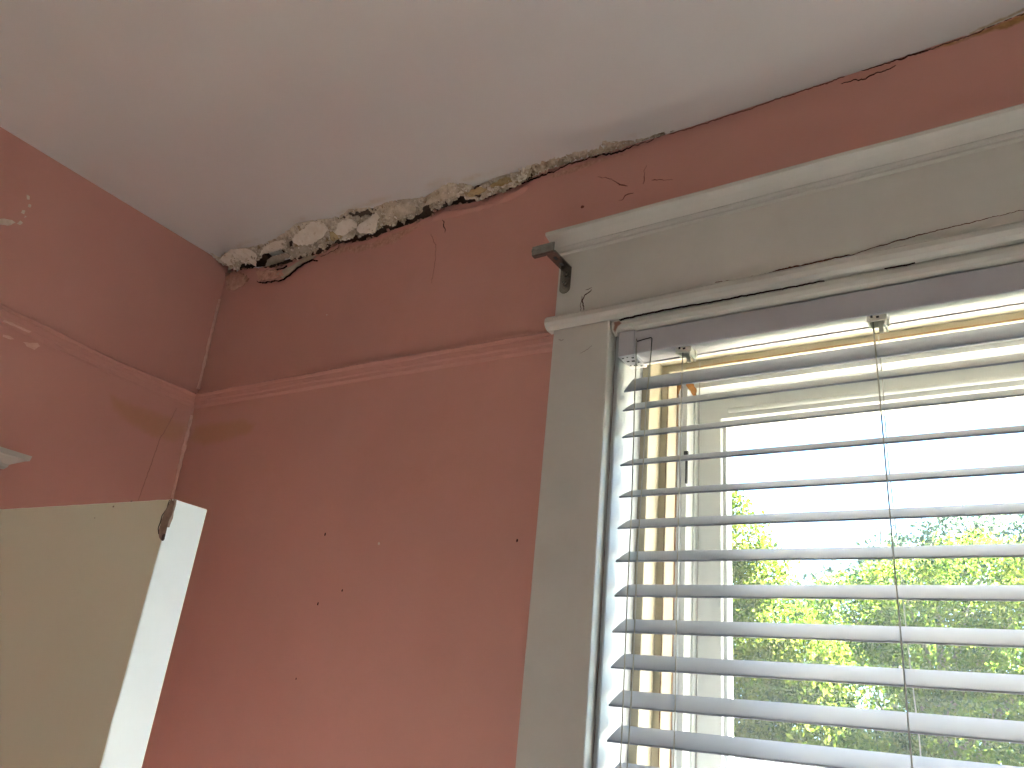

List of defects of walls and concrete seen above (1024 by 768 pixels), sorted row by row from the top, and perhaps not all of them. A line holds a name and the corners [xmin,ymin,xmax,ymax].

crack [671,14,1024,134]
crack [257,246,339,284]
flaking render [211,130,674,291]